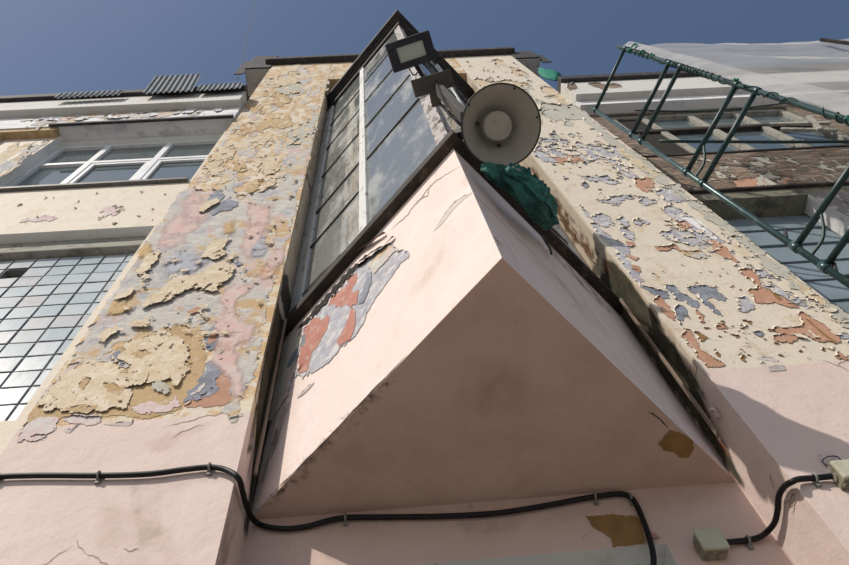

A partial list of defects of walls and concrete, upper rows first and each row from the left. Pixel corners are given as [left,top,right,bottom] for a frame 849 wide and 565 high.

peeling [17,63,335,442]
peeling [268,232,409,422]
peeling [473,58,849,369]
crack [44,539,109,565]
peeling [586,514,659,547]
peeling [658,430,694,458]